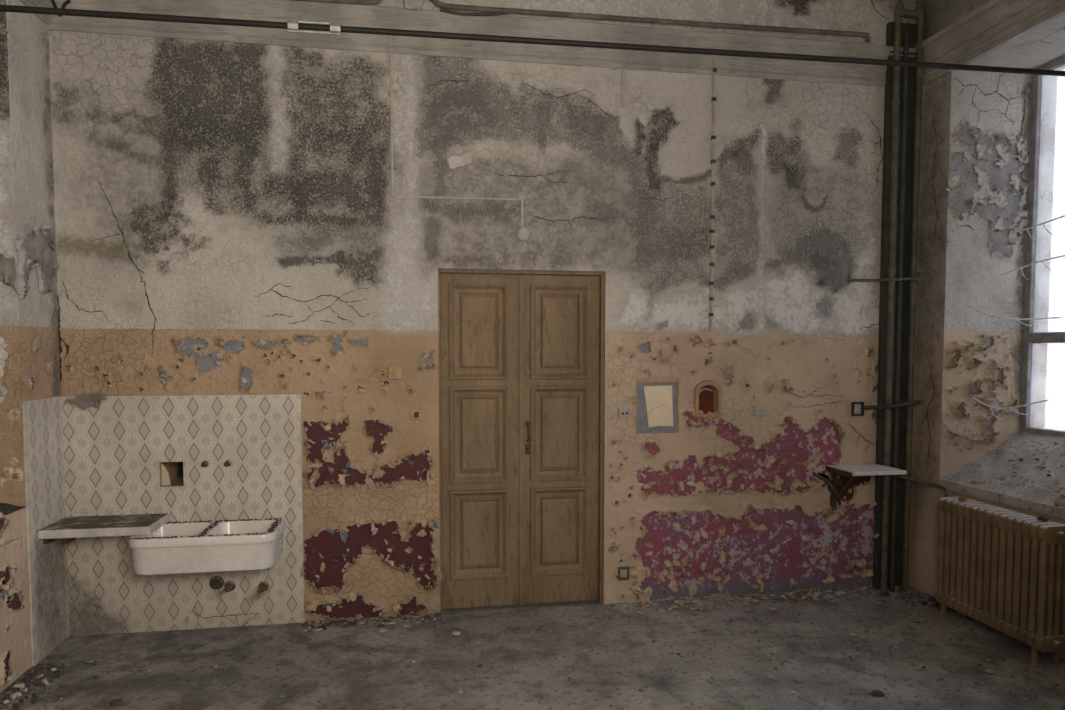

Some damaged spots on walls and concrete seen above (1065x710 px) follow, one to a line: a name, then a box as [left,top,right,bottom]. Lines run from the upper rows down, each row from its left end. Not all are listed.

leakage [0,0,10,117]
leakage [523,0,827,36]
leakage [0,219,15,260]
crack [90,182,156,355]
peeling [155,330,372,394]
crack [255,283,371,324]
leakage [131,38,881,336]
peeling [946,117,1030,262]
crack [954,74,1026,201]
peeling [301,388,436,493]
peeling [628,405,879,601]
peeling [300,515,442,621]